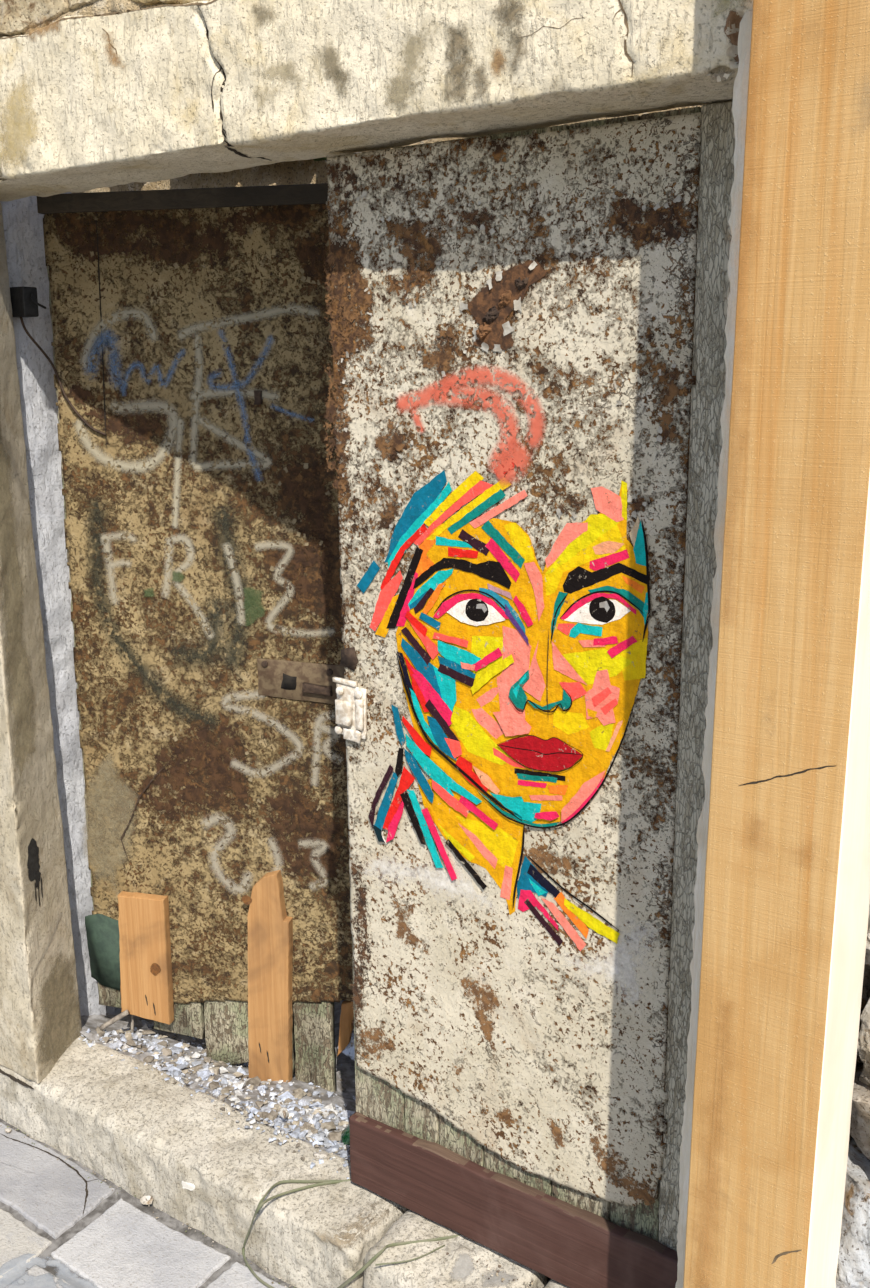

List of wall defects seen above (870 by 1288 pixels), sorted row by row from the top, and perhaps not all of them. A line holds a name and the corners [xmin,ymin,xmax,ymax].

crack [0,0,272,161]
water stain [387,34,423,108]
water stain [445,0,524,100]
crack [513,0,633,77]
crack [739,766,834,786]
rust [460,976,500,1051]
rust [590,1120,657,1207]